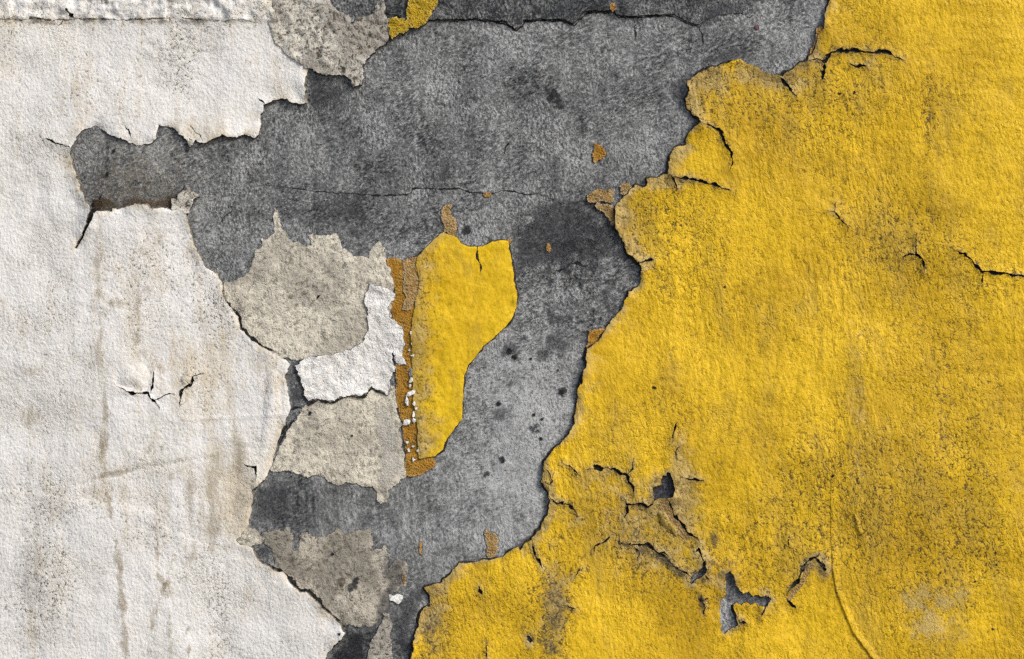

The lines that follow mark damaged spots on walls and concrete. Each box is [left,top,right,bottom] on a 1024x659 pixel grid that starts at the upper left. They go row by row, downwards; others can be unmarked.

crack [429,11,716,44]
crack [813,47,900,80]
crack [672,124,733,190]
crack [254,185,587,217]
crack [77,194,103,246]
crack [902,244,925,268]
crack [952,248,1024,283]
peeling [70,0,827,659]
crack [122,371,203,408]
crack [545,462,709,614]